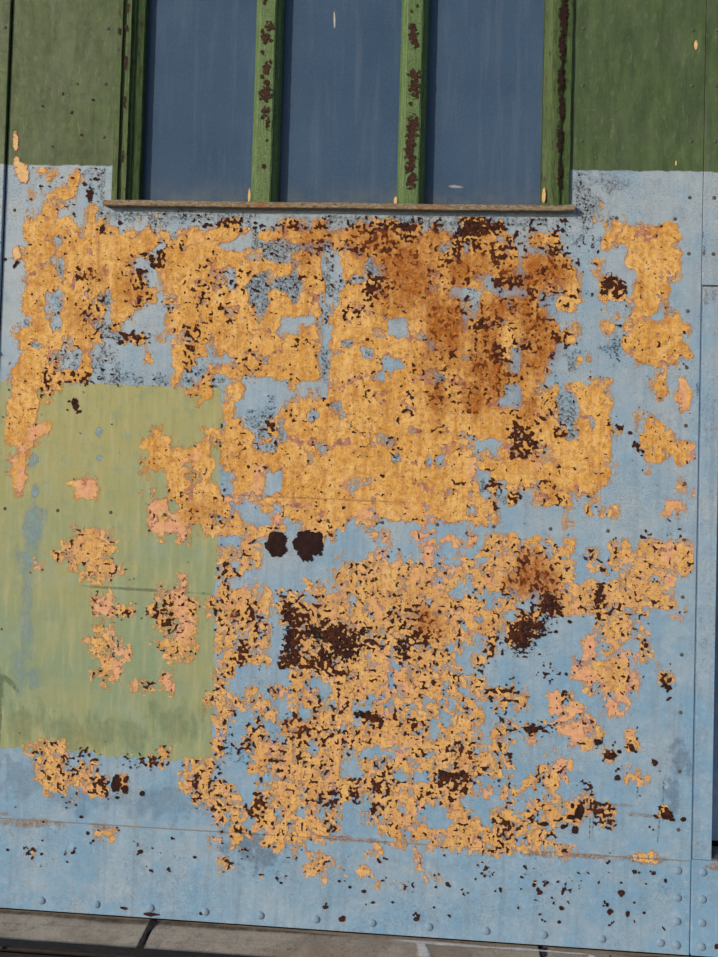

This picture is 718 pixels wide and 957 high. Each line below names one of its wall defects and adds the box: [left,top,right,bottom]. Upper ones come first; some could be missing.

rust [450,221,500,237]
peeling [2,131,696,893]
rust [264,530,324,562]
rust [278,607,370,670]
rust [394,638,411,660]
rust [594,714,660,797]
rust [511,779,617,924]
rust [629,849,667,885]